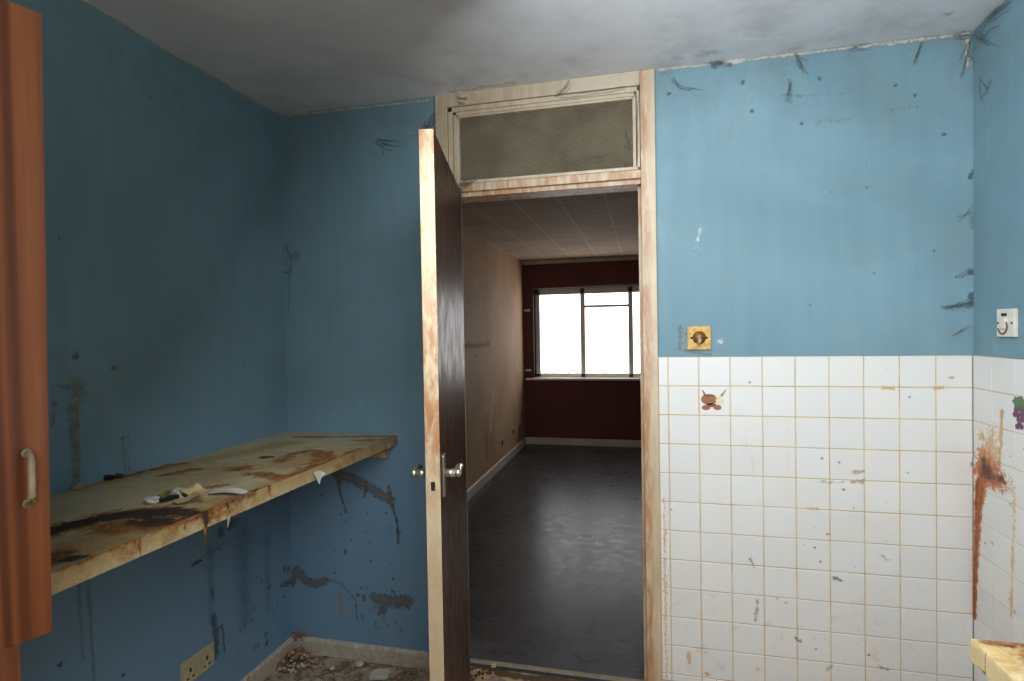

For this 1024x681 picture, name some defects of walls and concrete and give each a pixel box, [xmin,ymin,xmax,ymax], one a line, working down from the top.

peeling [657,32,970,71]
rust [973,429,1012,620]
peeling [361,587,414,625]